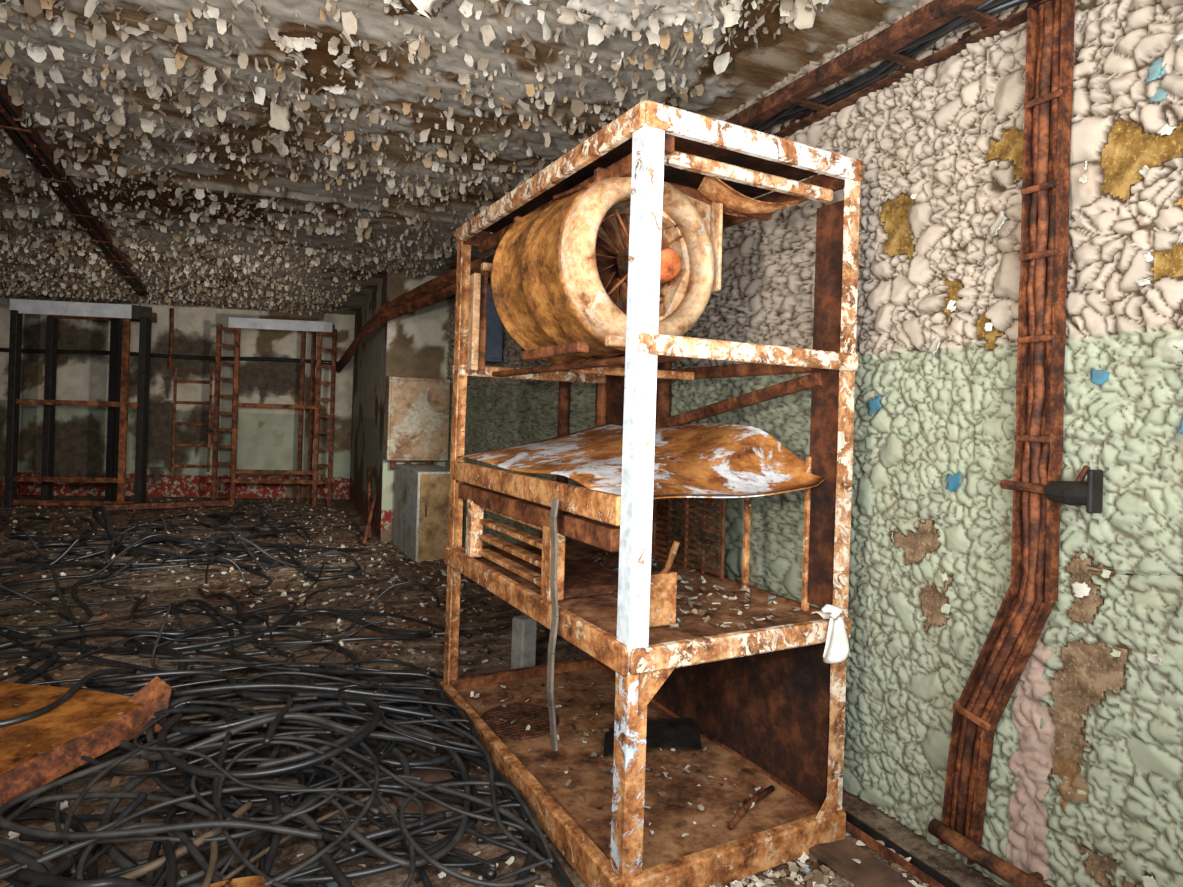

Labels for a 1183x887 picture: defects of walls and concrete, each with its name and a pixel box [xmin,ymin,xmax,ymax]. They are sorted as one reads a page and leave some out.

peeling [0,0,829,317]
peeling [1101,118,1183,201]
peeling [879,193,918,261]
peeling [1134,231,1183,286]
peeling [942,277,963,324]
water stain [22,319,106,362]
water stain [129,329,222,483]
water stain [233,354,300,404]
water stain [28,415,105,489]
peeling [890,518,940,573]
peeling [920,572,952,631]
flaking render [1006,551,1127,880]